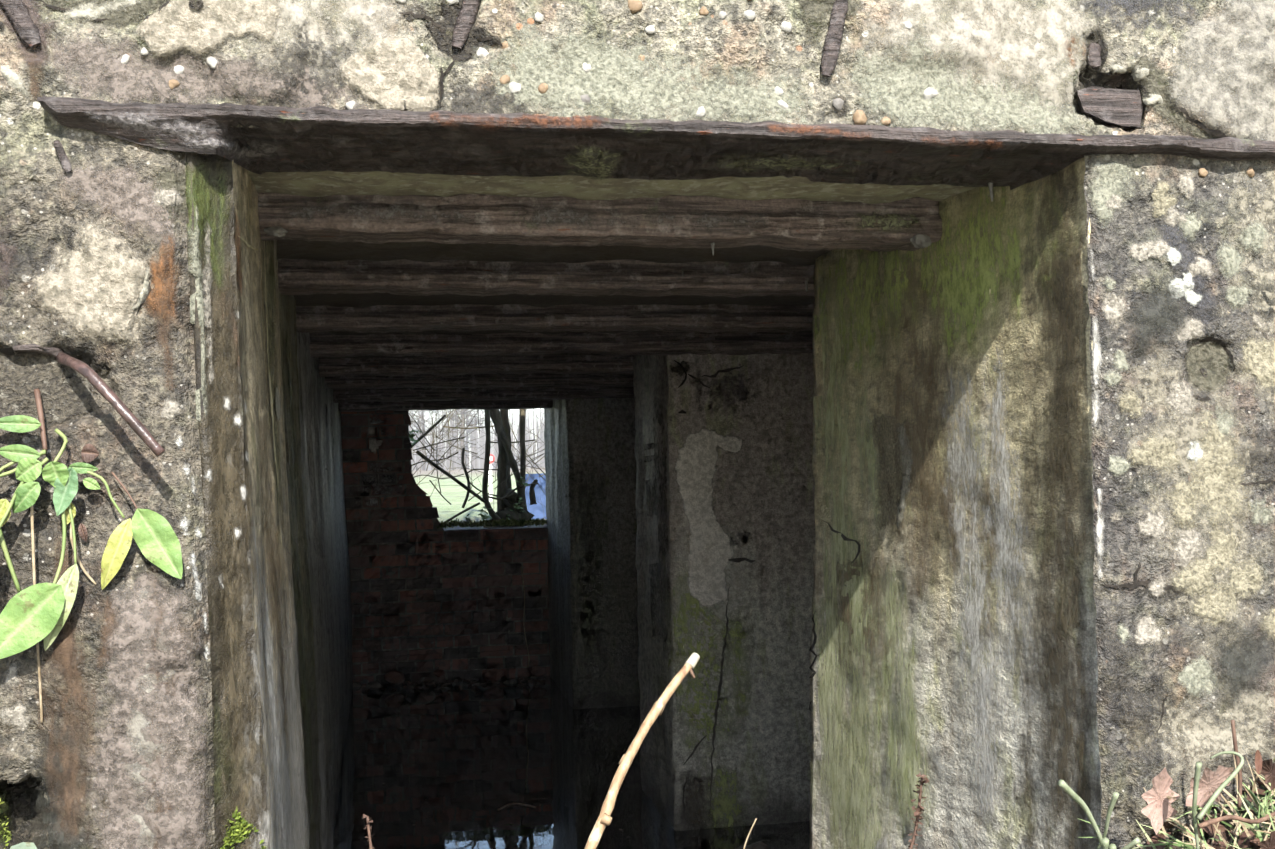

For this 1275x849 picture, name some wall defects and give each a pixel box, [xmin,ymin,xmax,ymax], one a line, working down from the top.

rust [146,246,175,387]
water stain [192,554,201,600]
water stain [207,212,333,849]
flaking render [675,429,751,607]
crack [682,558,755,821]
crack [809,611,817,711]
crack [822,520,861,563]
water stain [836,560,886,666]
water stain [885,162,1275,849]